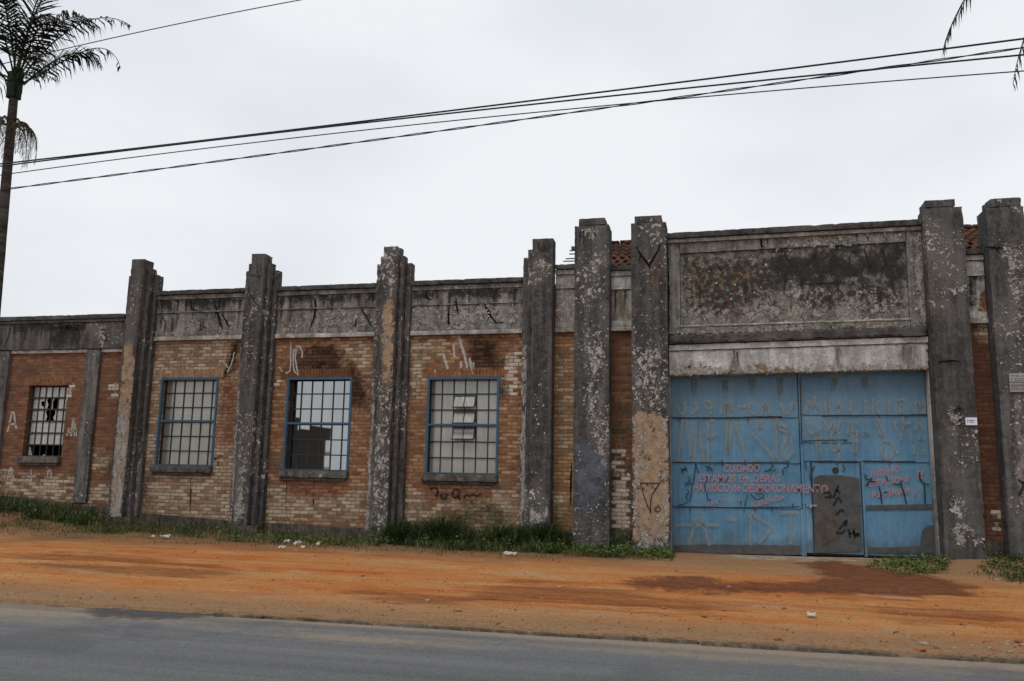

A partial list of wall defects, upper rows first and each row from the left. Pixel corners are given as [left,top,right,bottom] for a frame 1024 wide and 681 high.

spalling [108,342,140,517]
crack [190,299,236,375]
crack [310,297,319,327]
leakage [337,344,371,393]
spalling [365,299,395,531]
crack [484,304,502,324]
peeling [499,251,609,546]
mould [681,243,908,328]
spalling [631,231,963,549]
peeling [948,496,985,547]